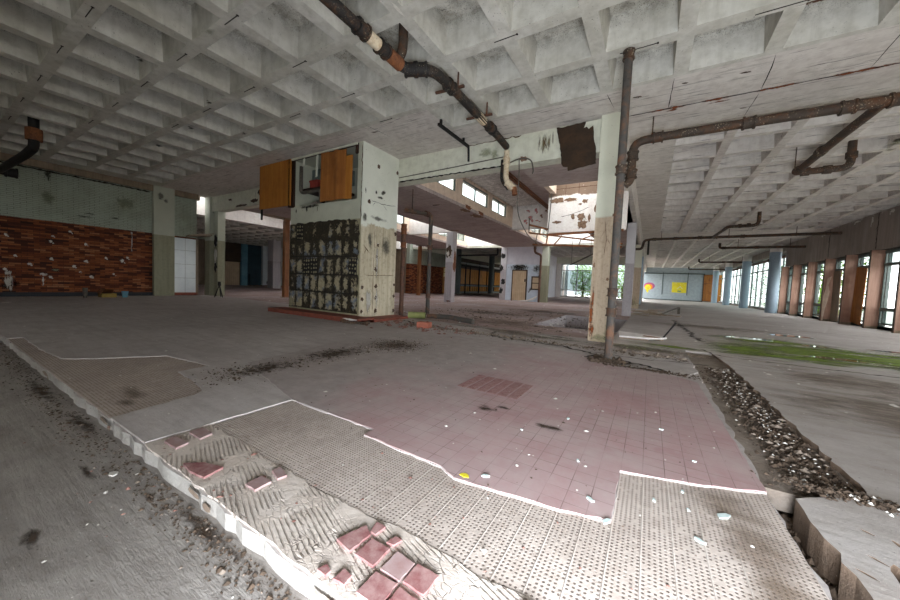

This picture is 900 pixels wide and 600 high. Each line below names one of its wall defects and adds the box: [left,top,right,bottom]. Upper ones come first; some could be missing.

peeling [550,198,596,229]